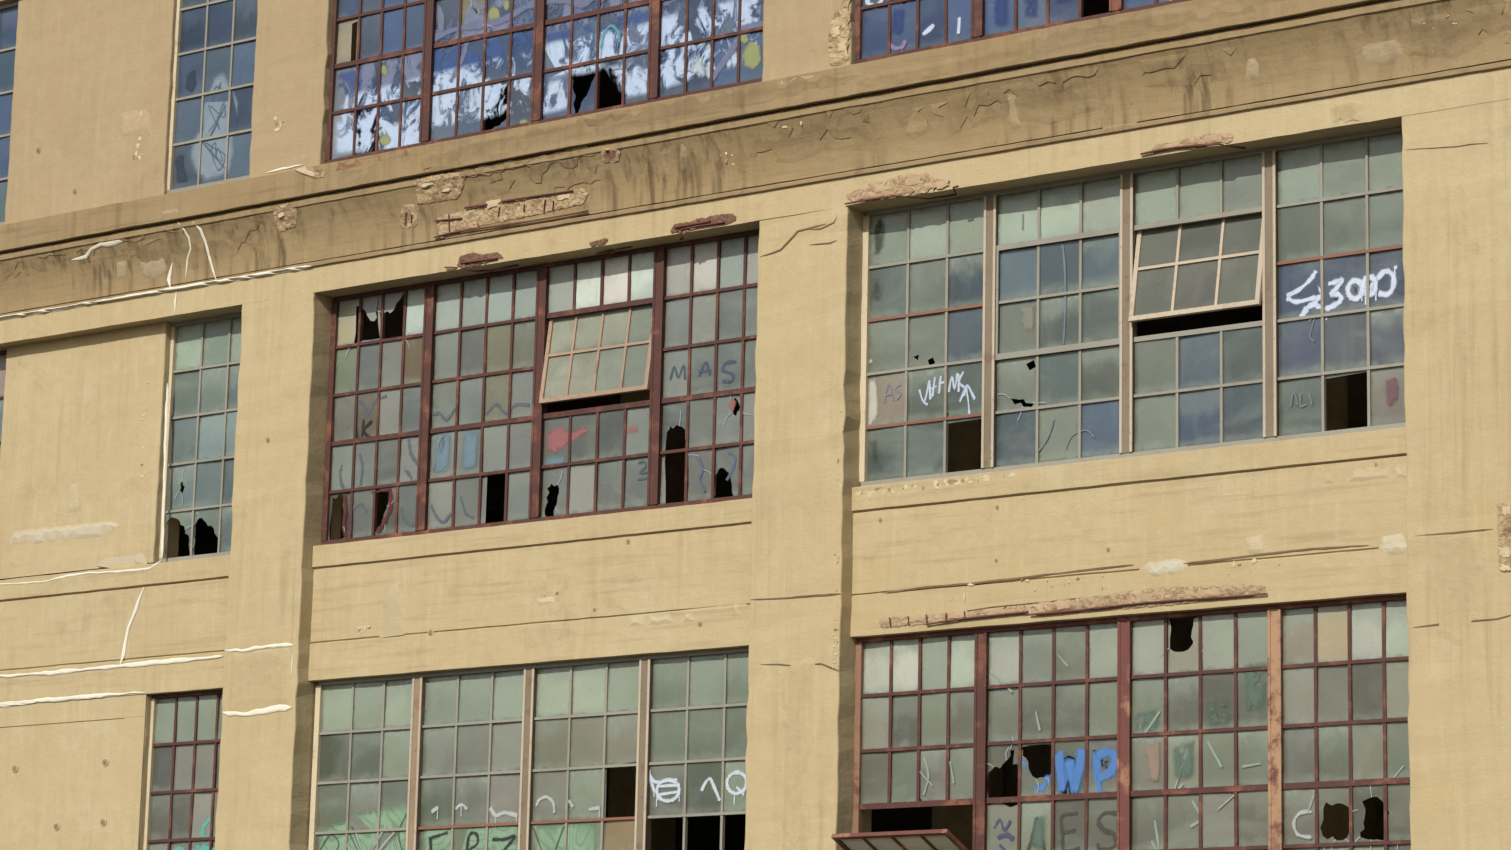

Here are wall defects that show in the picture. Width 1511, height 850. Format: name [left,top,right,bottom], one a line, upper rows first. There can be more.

leakage [1403,0,1511,59]
leakage [419,0,1257,196]
crack [0,222,311,320]
spalling [445,252,518,272]
spalling [400,172,588,238]
crack [760,217,837,257]
spalling [844,173,959,205]
crack [0,383,293,716]